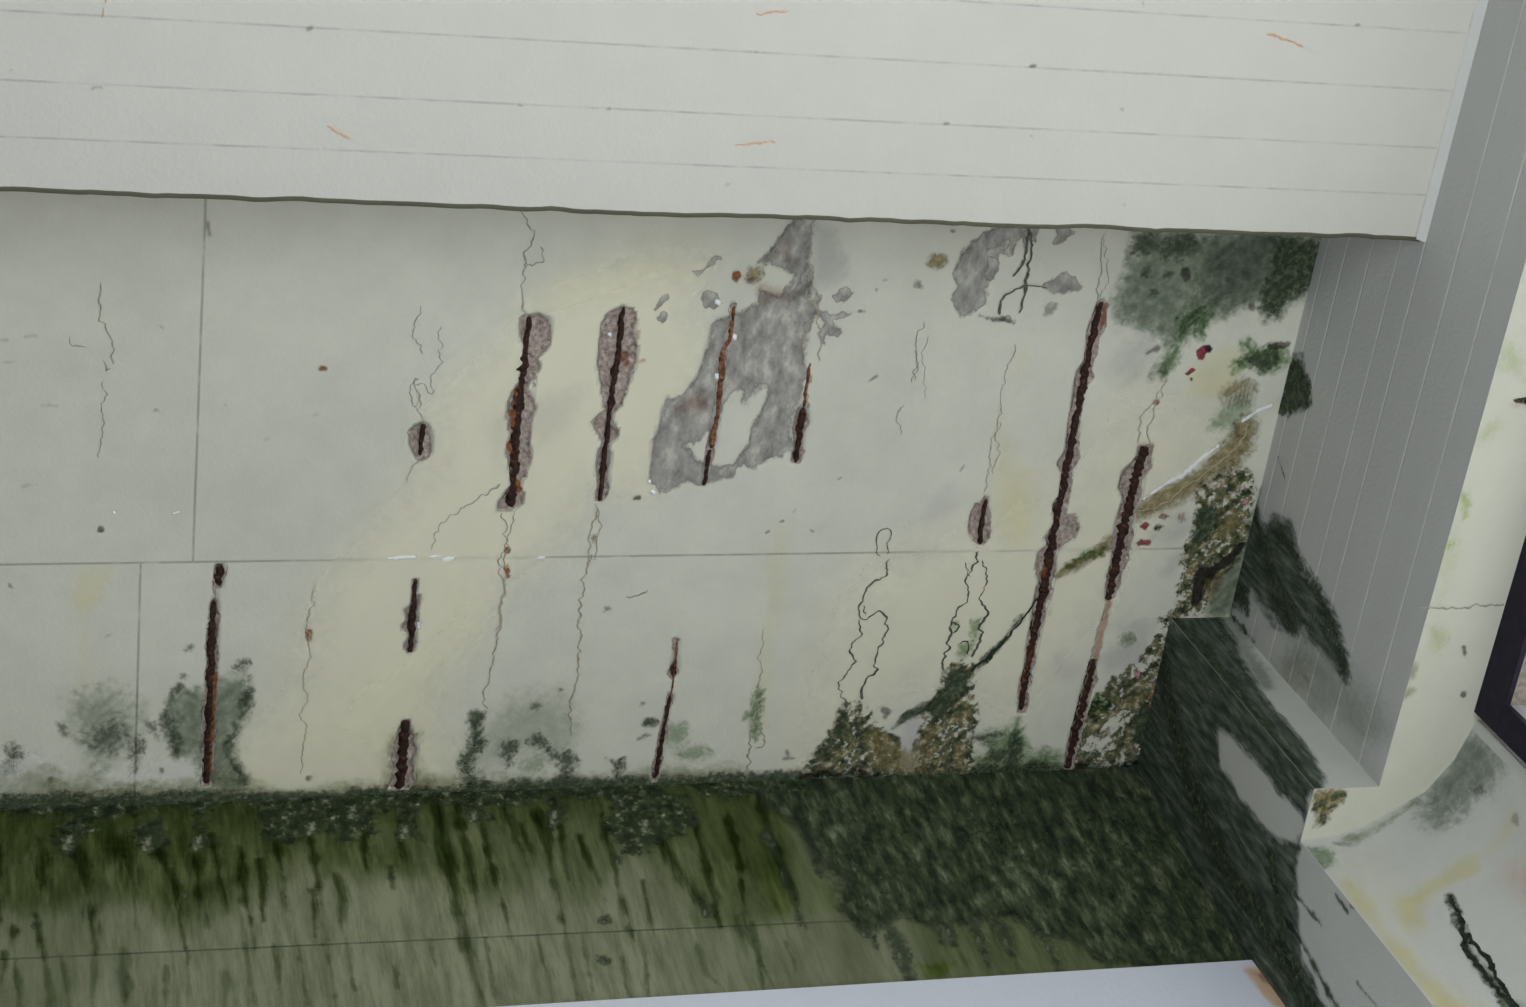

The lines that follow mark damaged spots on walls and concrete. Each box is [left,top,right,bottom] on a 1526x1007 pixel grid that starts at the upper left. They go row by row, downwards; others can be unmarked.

peeling [951,228,1081,324]
peeling [649,219,853,493]
crack [838,528,892,705]
crack [900,403,1273,720]
water stain [193,834,280,921]
water stain [850,915,916,981]
crack [1445,894,1520,1007]